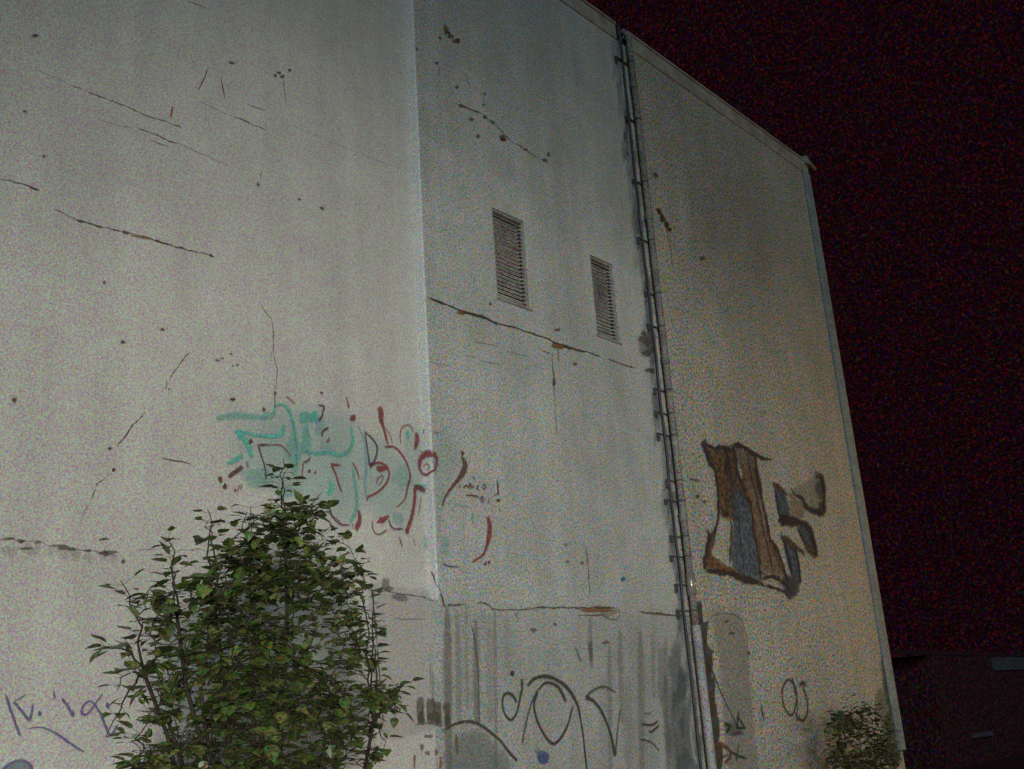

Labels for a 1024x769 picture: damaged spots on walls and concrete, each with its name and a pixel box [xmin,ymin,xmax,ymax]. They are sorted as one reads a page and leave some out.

crack [72,85,181,146]
crack [455,85,550,163]
crack [57,210,214,257]
crack [260,304,278,392]
crack [429,297,633,431]
crack [431,548,689,620]